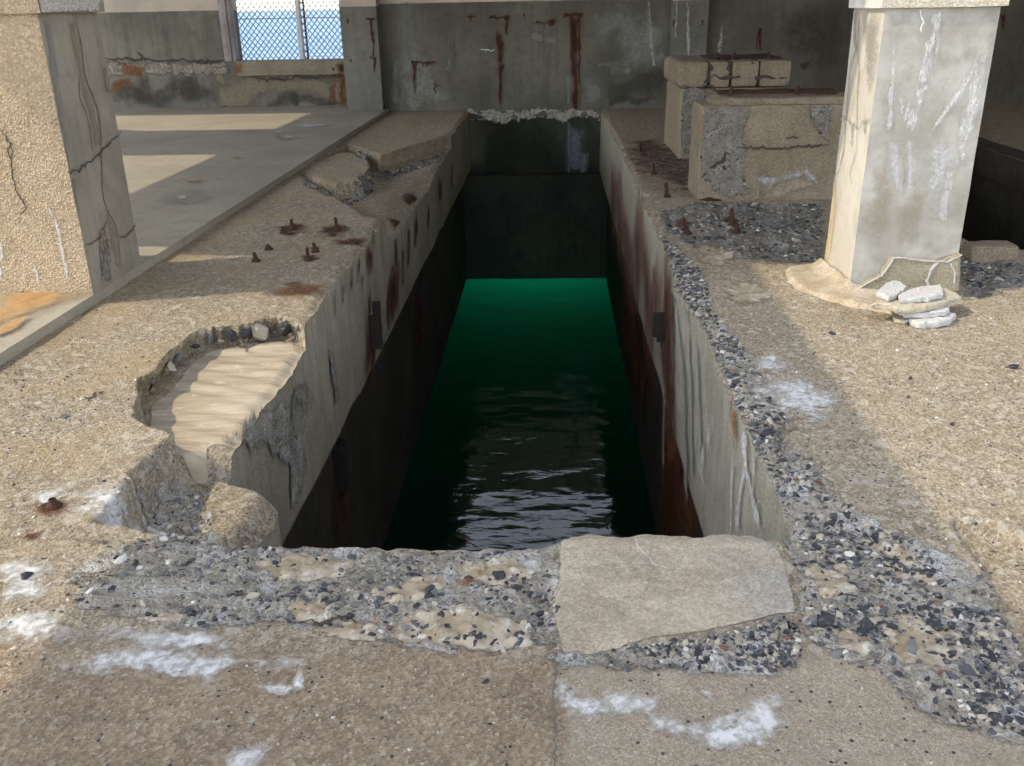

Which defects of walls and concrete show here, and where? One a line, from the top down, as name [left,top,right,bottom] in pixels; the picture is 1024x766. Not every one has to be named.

crack [0,129,27,220]
crack [67,24,223,258]
rust [489,15,509,104]
rust [523,13,583,109]
rust [623,140,689,195]
crack [701,15,859,193]
water stain [886,10,942,195]
water stain [929,54,987,220]
spalling [63,106,1024,745]
rust [609,168,697,538]
water stain [62,629,239,680]
water stain [258,658,304,695]